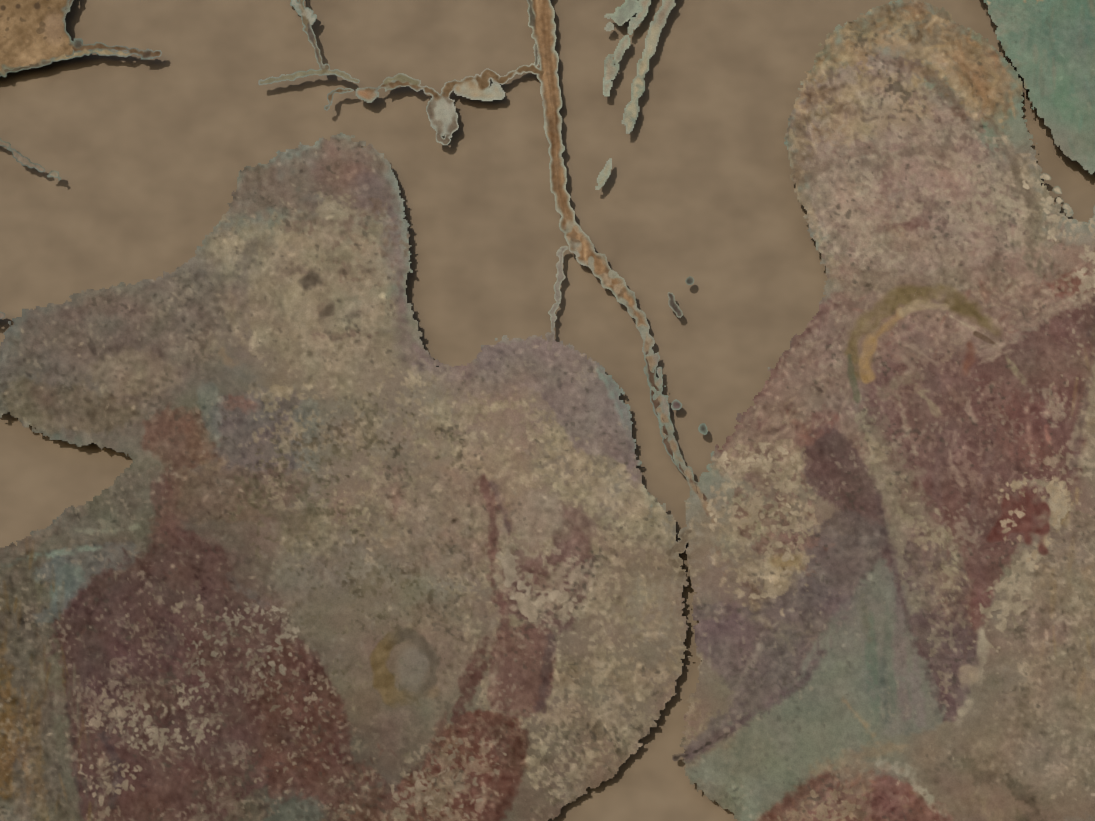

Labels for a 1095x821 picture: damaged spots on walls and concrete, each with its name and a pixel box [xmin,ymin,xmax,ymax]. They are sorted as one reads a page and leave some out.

crack [0,138,61,181]
flaking render [0,0,162,77]
crack [258,0,731,578]
flaking render [955,466,1073,719]